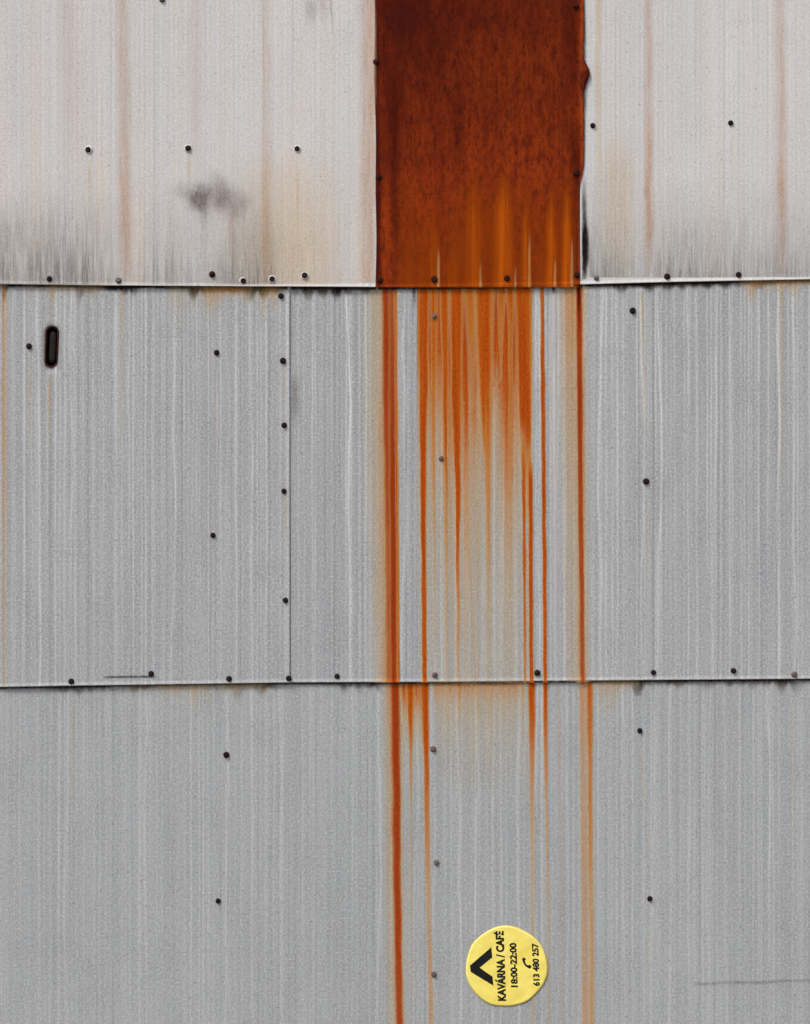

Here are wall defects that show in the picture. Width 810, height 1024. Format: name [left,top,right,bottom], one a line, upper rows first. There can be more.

corrosion [382,182,593,1024]